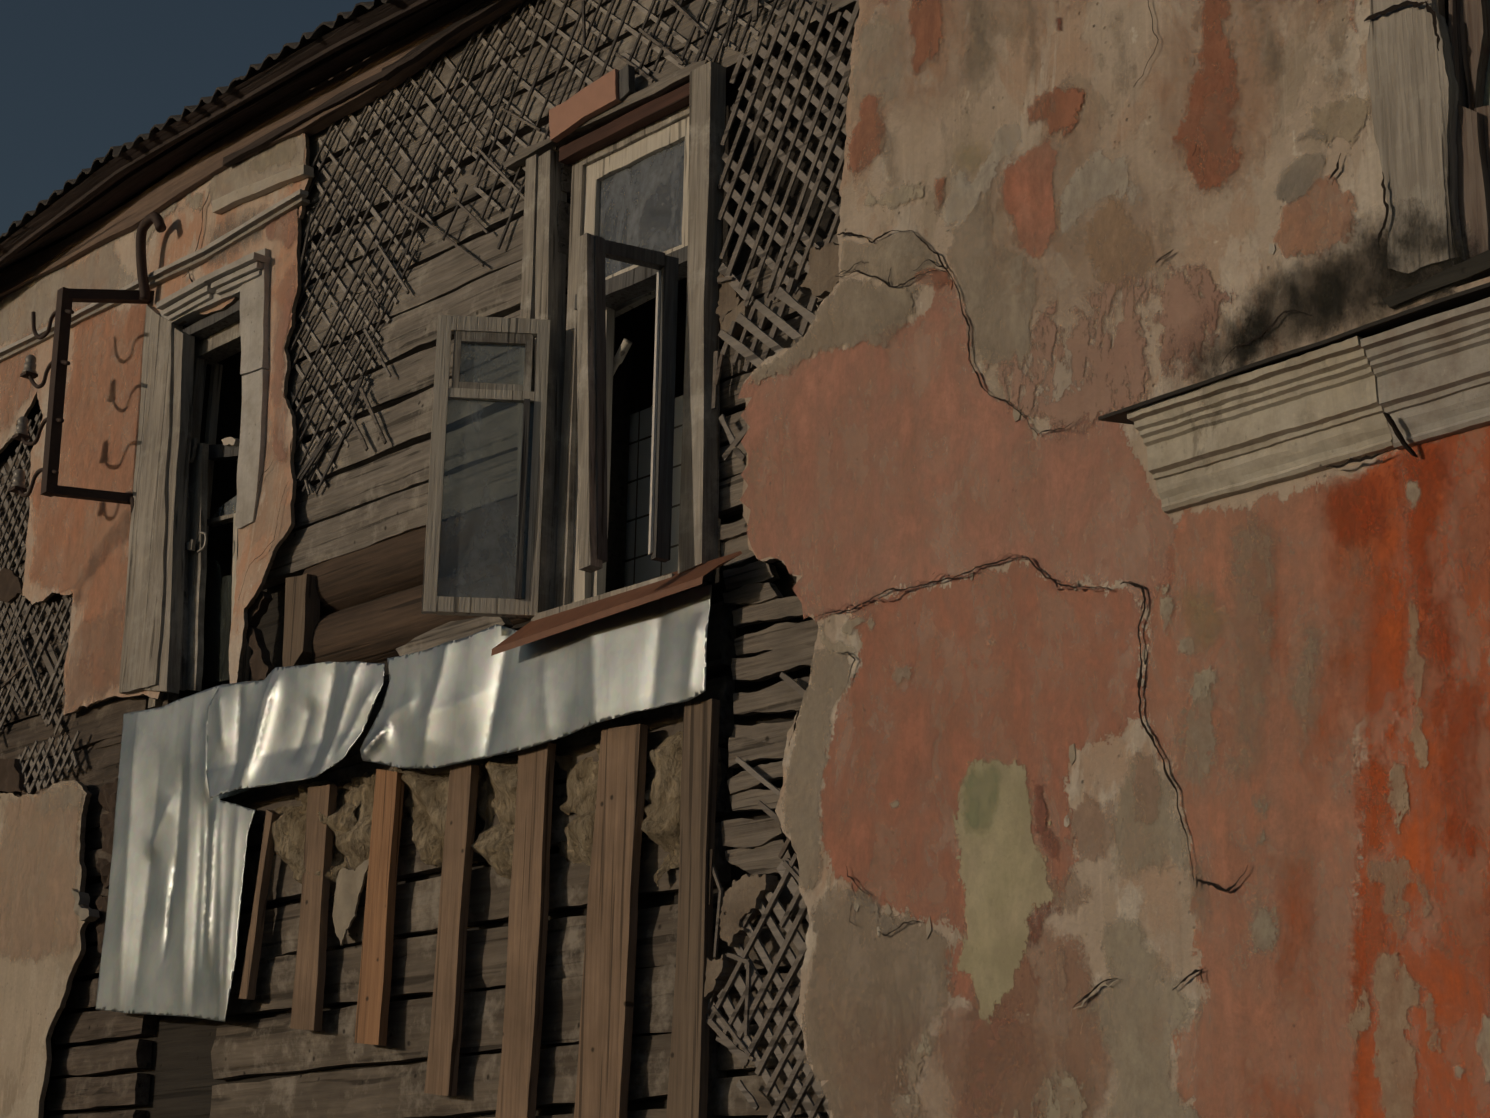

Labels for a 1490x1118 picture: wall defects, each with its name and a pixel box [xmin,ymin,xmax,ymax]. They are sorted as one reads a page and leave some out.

peeling [134,133,305,245]
crack [836,230,1072,436]
peeling [934,85,1085,259]
peeling [984,265,1237,440]
peeling [1172,0,1243,192]
leakage [1201,205,1463,375]
peeling [30,304,144,690]
peeling [782,649,856,892]
spalling [953,759,1058,1025]
crack [814,552,1248,892]
peeling [1346,856,1440,1118]
rust [1329,425,1490,1118]